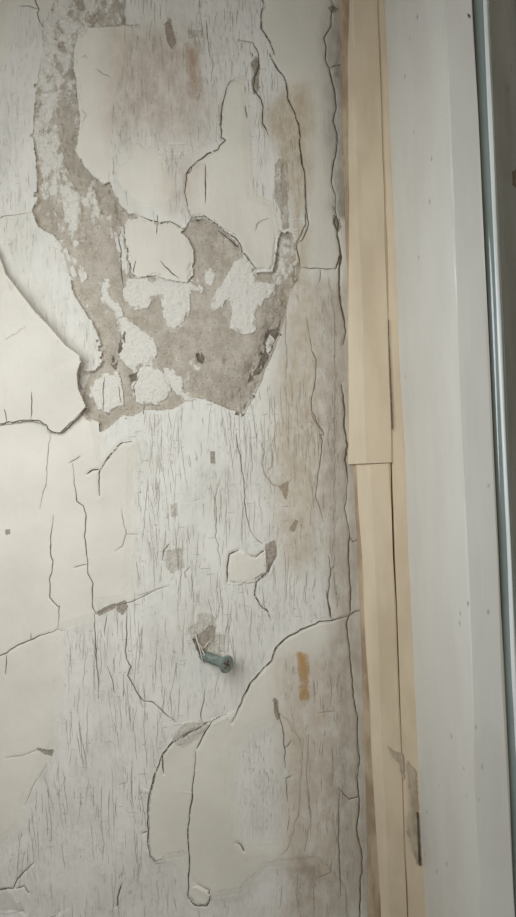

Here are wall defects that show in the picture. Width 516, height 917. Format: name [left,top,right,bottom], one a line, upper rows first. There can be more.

peeling [0,0,361,917]
crack [0,319,363,917]
crack [118,0,346,344]